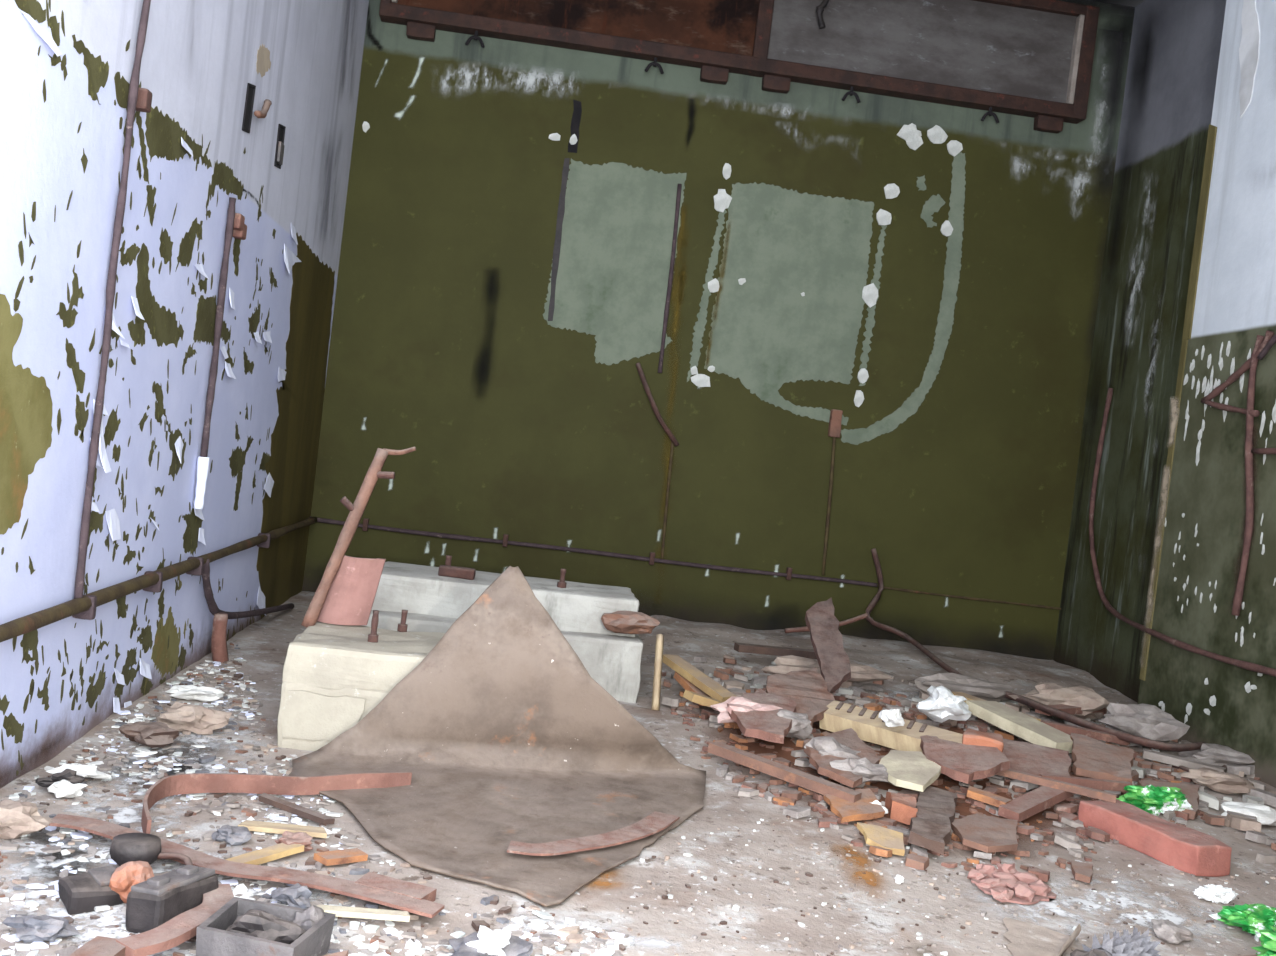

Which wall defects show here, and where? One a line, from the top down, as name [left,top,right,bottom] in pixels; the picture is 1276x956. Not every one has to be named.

leakage [443,70,488,88]
leakage [517,72,559,88]
peeling [714,163,732,212]
peeling [876,183,900,225]
peeling [691,365,715,387]
peeling [854,368,869,407]
peeling [1169,341,1251,465]
peeling [1259,402,1276,465]
peeling [0,0,335,956]
peeling [1173,513,1217,613]
peeling [1184,678,1216,724]
peeling [471,895,626,956]